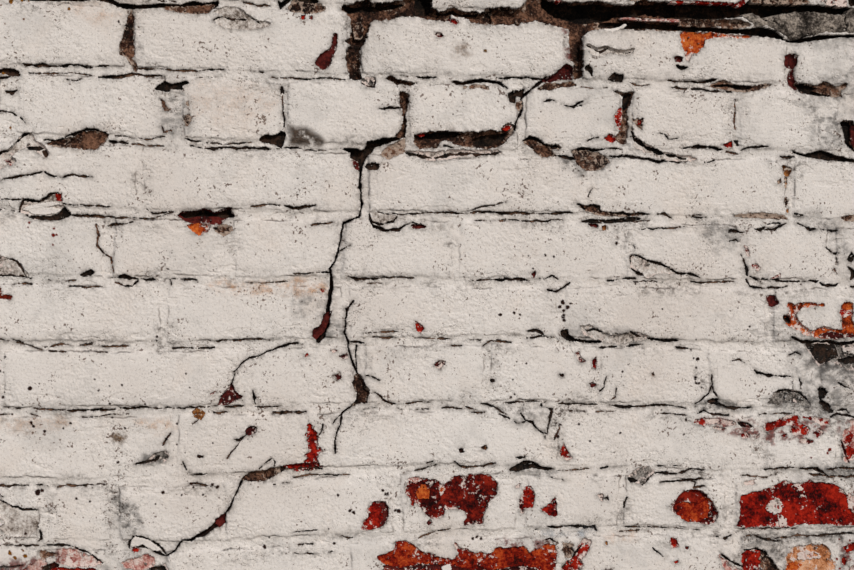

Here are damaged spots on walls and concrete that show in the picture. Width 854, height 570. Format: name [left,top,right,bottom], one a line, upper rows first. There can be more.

peeling [315,0,854,88]
crack [0,63,224,123]
peeling [365,73,772,171]
crack [63,203,174,227]
crack [247,72,417,345]
crack [378,202,572,223]
crack [473,271,570,293]
crack [0,300,854,557]
peeling [405,473,498,526]
peeling [627,465,718,525]
peeling [716,479,854,540]
peeling [377,538,592,570]